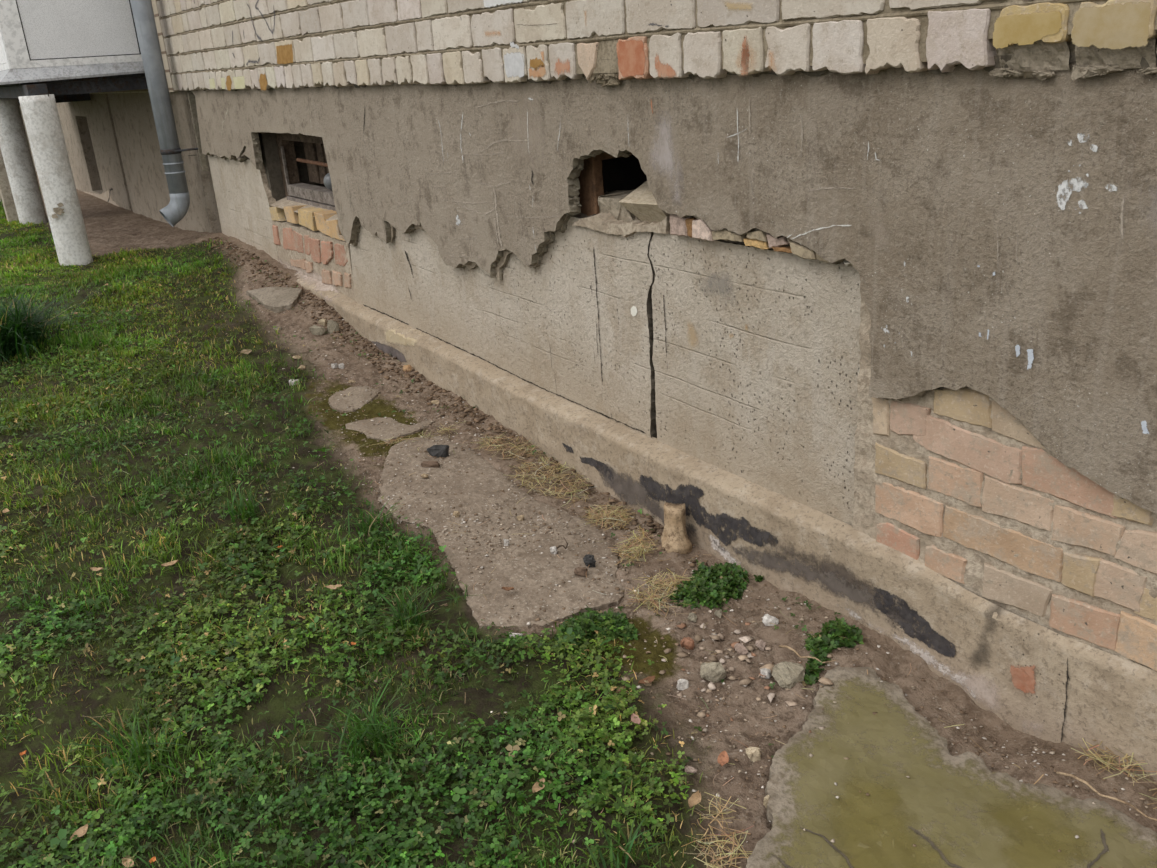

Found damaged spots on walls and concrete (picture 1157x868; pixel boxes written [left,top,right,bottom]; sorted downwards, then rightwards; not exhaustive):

spalling [983,36,1157,81]
crack [648,234,668,368]
peeling [350,151,1157,671]
crack [1061,659,1070,742]